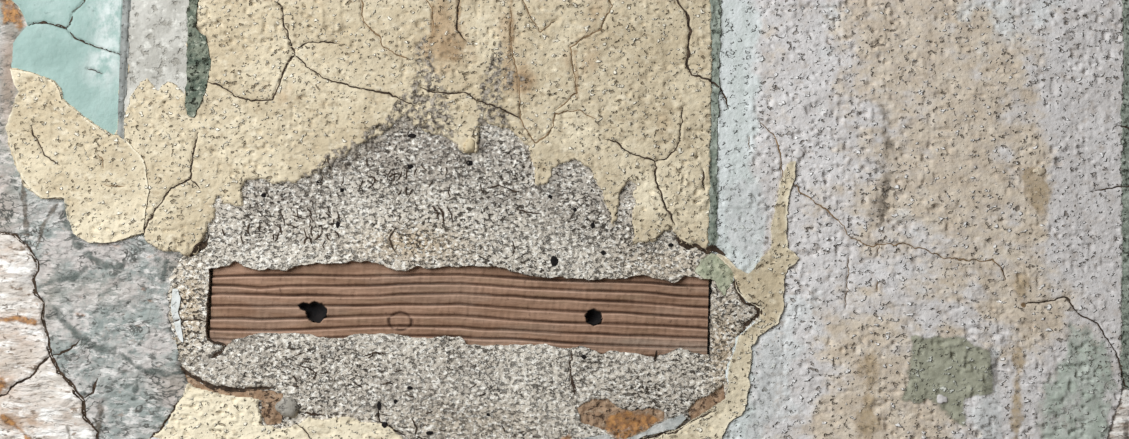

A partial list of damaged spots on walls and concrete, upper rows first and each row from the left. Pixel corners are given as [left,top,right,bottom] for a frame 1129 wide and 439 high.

crack [30,0,122,74]
crack [31,127,59,165]
crack [144,132,200,233]
spalling [0,0,799,439]
crack [209,0,762,335]
crack [748,121,1006,309]
corrosion [606,412,658,439]
crack [1025,296,1128,388]
peeling [1042,326,1129,439]